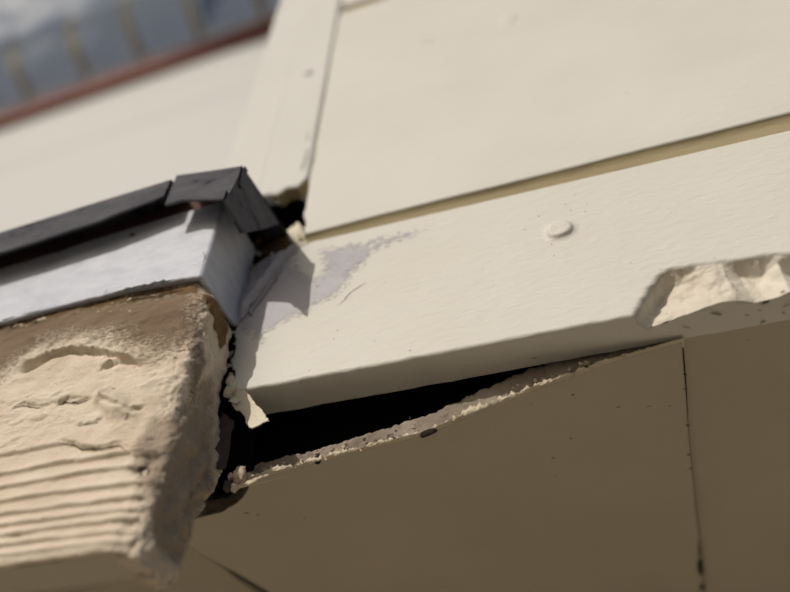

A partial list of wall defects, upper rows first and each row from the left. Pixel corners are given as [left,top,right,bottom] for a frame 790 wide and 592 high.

spalling [636,255,790,329]
crack [218,325,258,469]